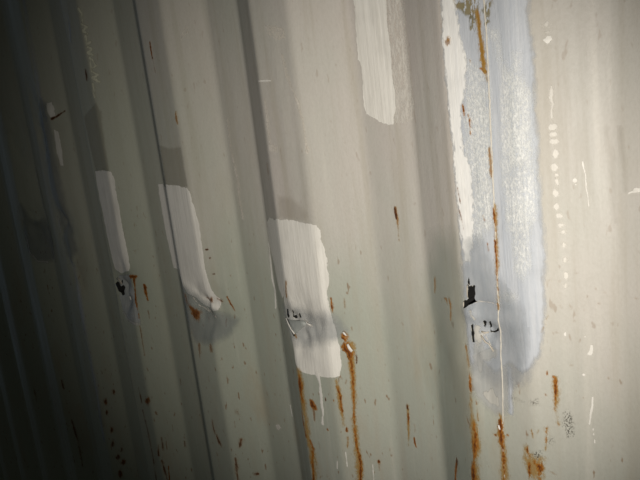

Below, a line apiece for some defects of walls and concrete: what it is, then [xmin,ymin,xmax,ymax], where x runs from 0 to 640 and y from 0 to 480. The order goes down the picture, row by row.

rust [476,10,487,79]
rust [129,275,149,315]
rust [297,369,317,480]
rust [325,381,343,417]
rust [341,331,363,480]
rust [469,374,480,480]
rust [494,416,509,480]
rust [524,447,544,480]